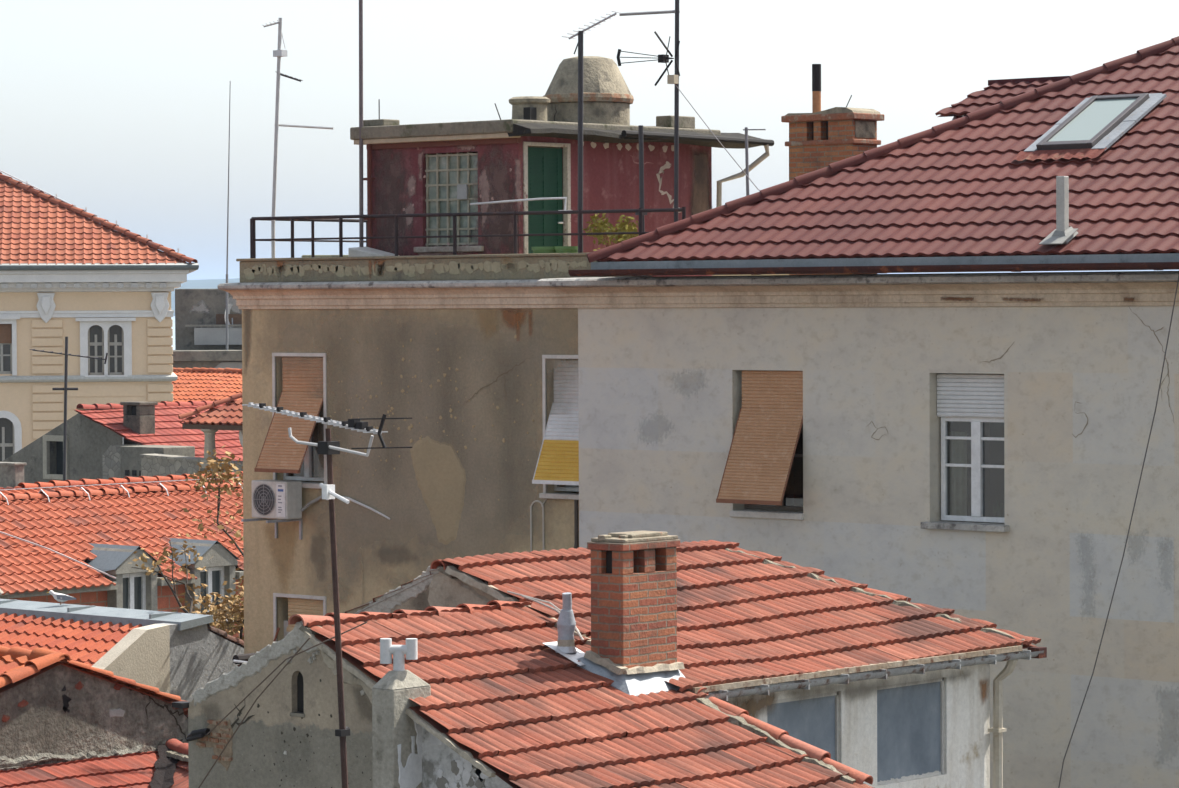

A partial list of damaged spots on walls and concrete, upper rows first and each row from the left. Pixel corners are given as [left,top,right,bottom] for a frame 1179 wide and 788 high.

flaking render [403,147,426,228]
peeling [583,142,680,213]
peeling [244,242,587,280]
corrosion [502,309,531,334]
crack [1129,307,1174,422]
water stain [281,309,578,569]
flaking render [196,719,233,771]